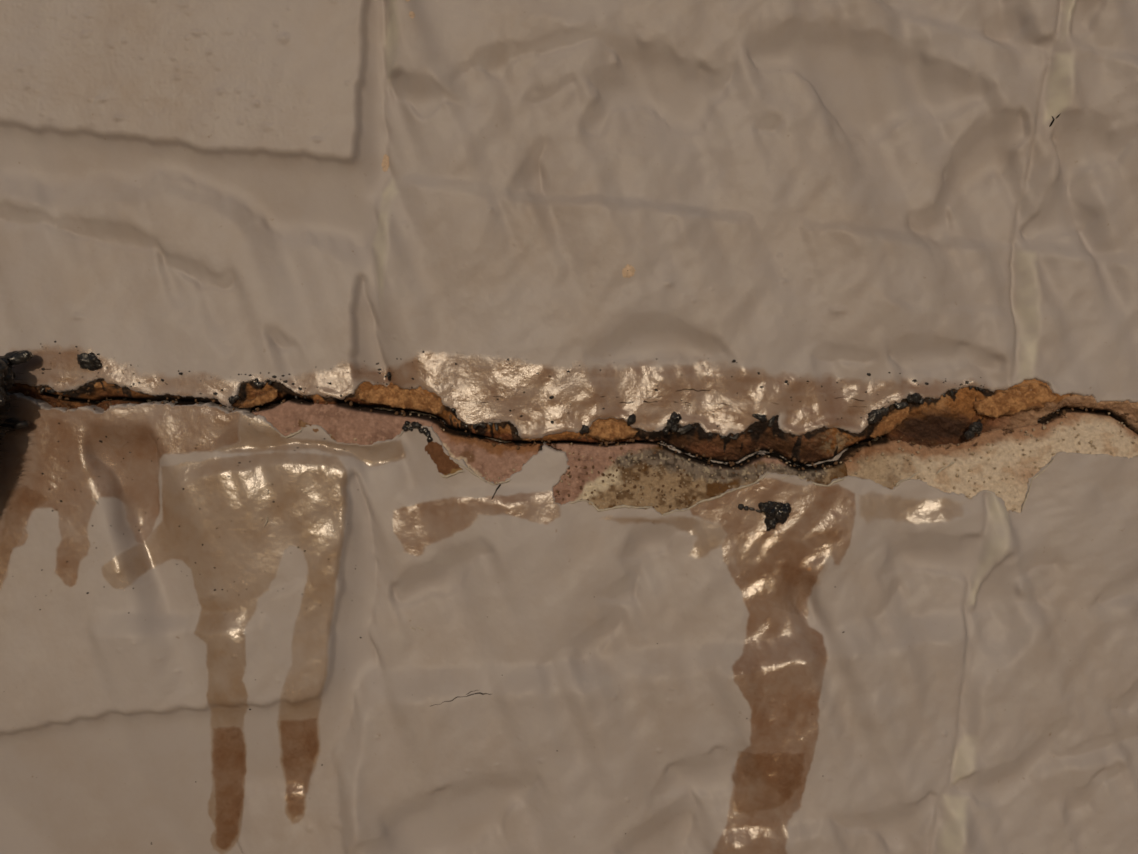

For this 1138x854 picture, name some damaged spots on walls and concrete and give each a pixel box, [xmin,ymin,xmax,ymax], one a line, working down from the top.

crack [7,378,1138,470]
peeling [251,400,1138,516]